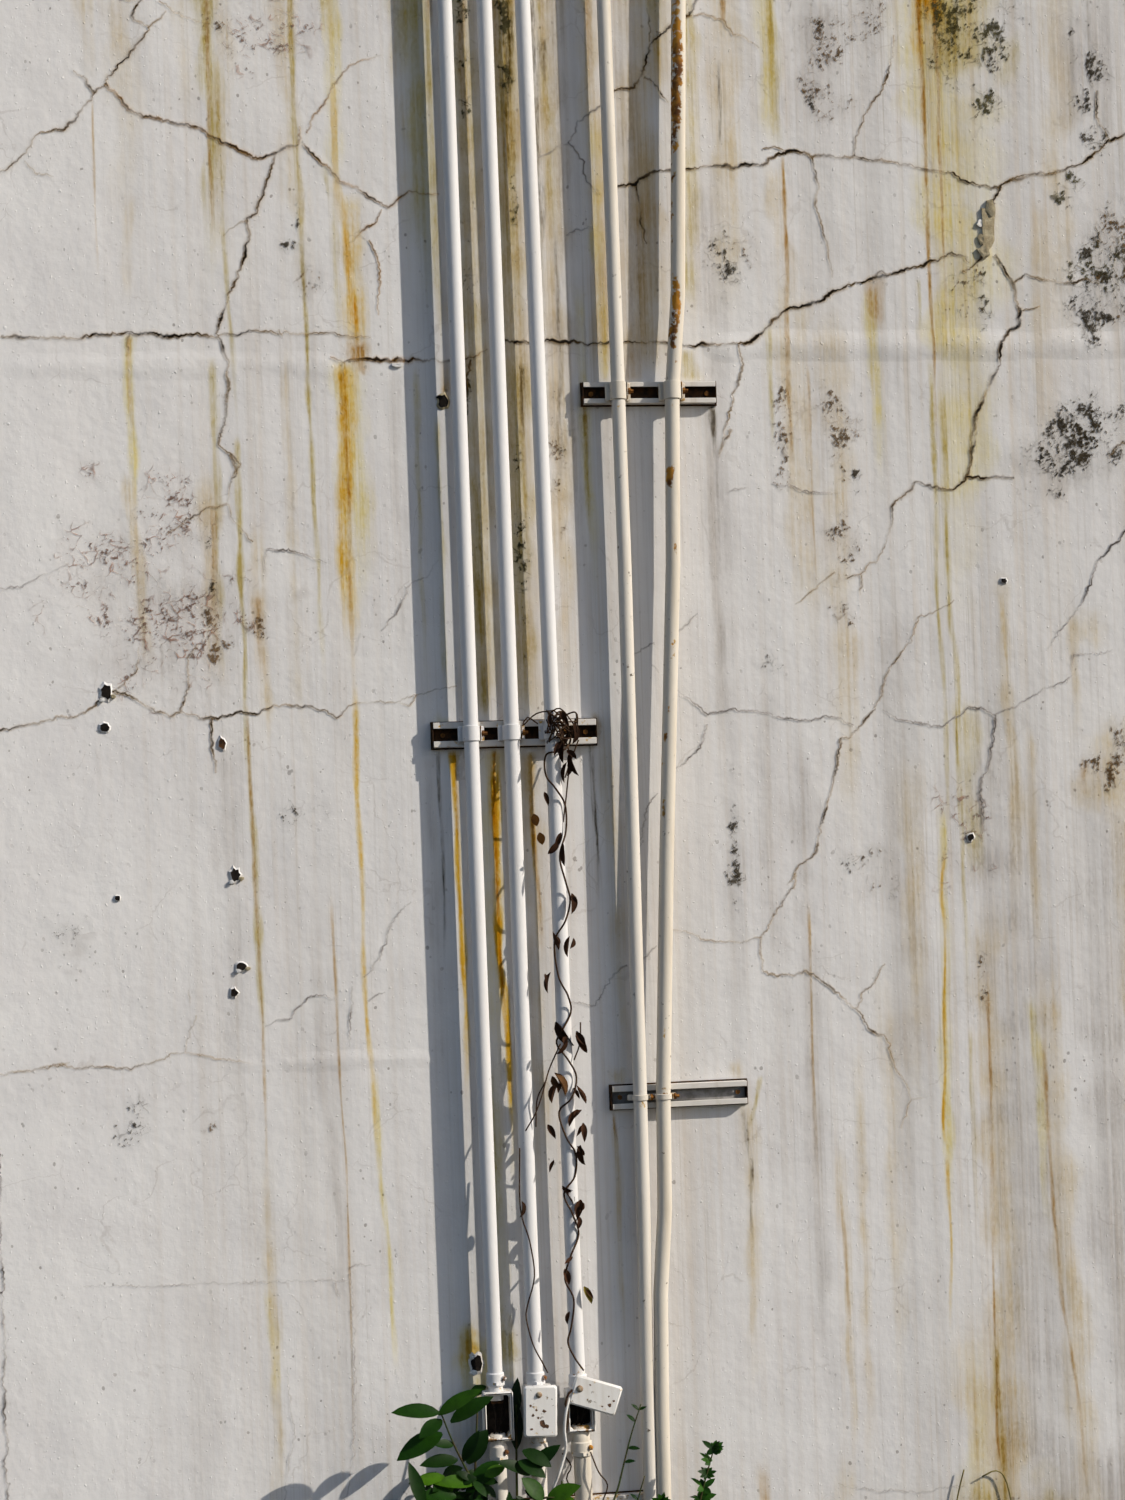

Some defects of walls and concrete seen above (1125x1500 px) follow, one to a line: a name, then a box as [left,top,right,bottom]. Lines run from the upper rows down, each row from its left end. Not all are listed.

water stain [798,2,884,123]
water stain [919,0,1014,119]
crack [5,0,1125,600]
water stain [1062,206,1125,346]
water stain [1020,394,1125,499]
water stain [58,472,268,691]
crack [0,655,416,764]
crack [687,530,1125,1060]
water stain [1072,728,1125,791]
crack [284,993,379,1033]
crack [0,1227,9,1500]